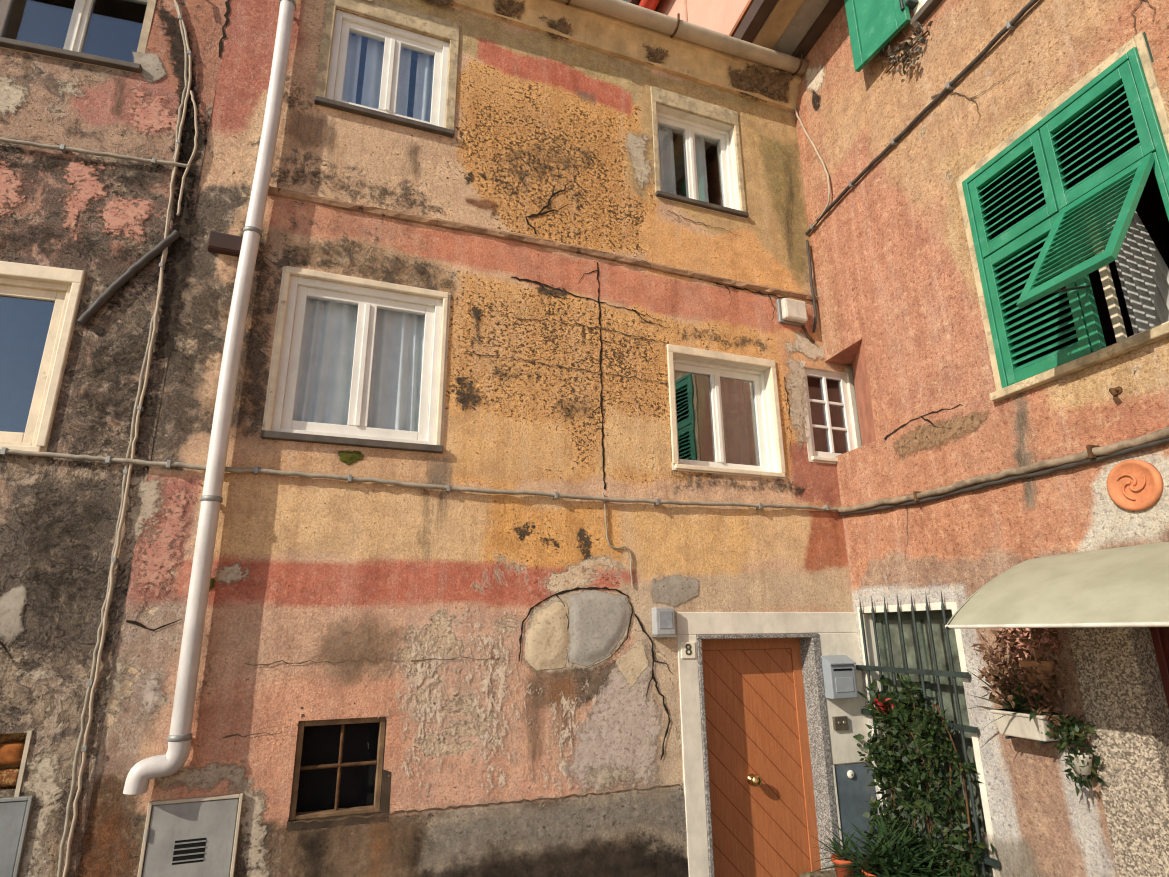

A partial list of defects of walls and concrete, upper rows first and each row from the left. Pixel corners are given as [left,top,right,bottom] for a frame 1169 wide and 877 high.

crack [219,0,230,58]
damp [0,150,146,186]
peeling [625,133,655,195]
crack [525,180,572,234]
crack [680,275,787,320]
crack [466,262,670,490]
crack [126,619,182,631]
crack [244,587,680,823]
spalling [0,730,33,797]
damp [291,826,689,877]